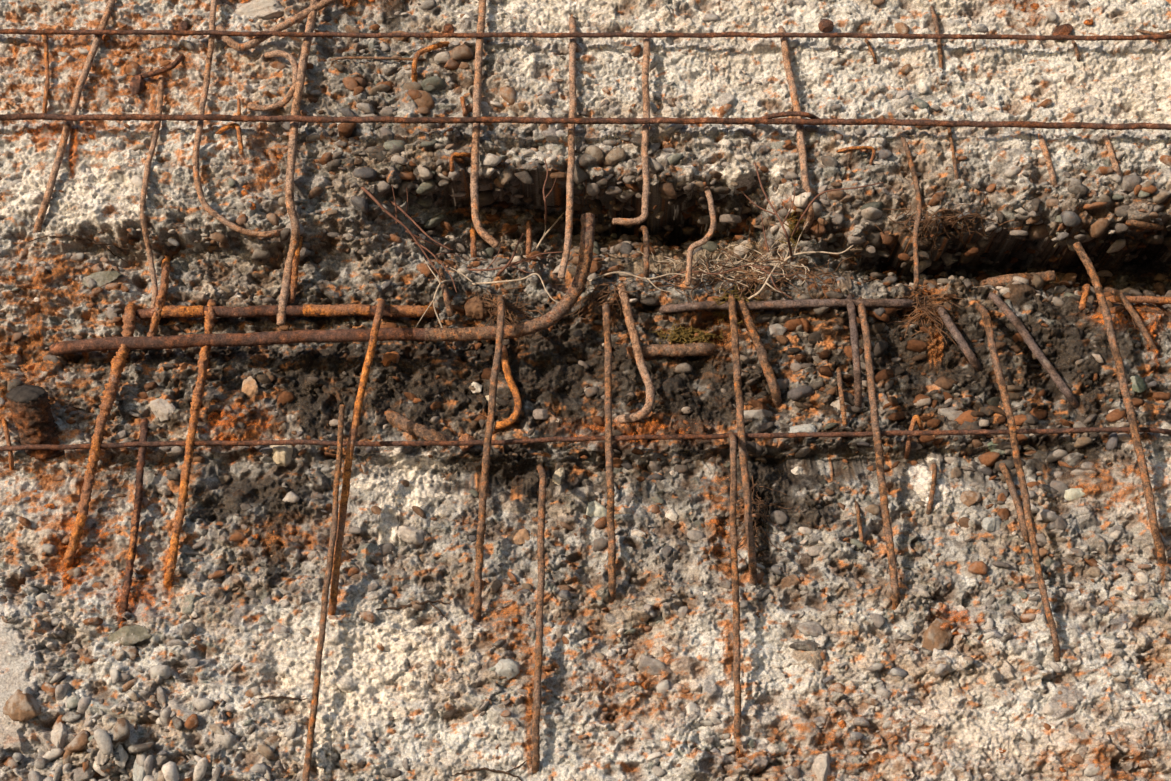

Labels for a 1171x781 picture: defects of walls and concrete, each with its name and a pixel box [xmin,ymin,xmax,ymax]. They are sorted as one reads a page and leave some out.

rust [5,21,201,178]
rust [99,264,170,412]
rust [190,299,272,441]
rust [906,285,951,365]
rust [0,456,133,590]
rust [116,509,172,628]
rust [704,465,738,583]
rust [1074,464,1153,510]
rust [483,592,536,772]
rust [587,653,676,728]
rust [724,631,732,680]
rust [771,709,939,781]